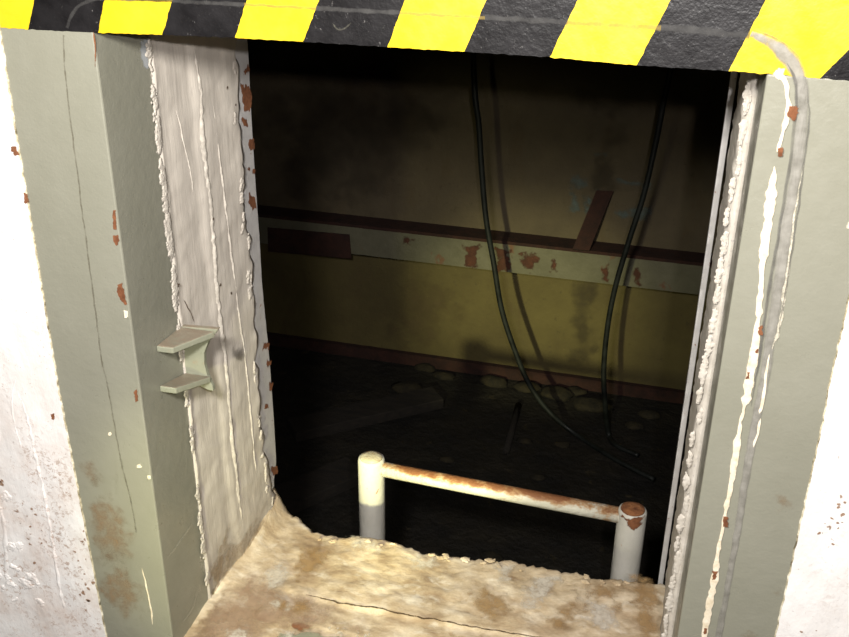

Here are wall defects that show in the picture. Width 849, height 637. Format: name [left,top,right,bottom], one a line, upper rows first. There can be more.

rust [240,65,252,127]
spalling [145,36,182,330]
spalling [239,177,251,250]
rust [464,245,479,269]
rust [494,247,540,273]
peeling [661,83,752,637]
peeling [701,32,810,637]
spalling [260,453,274,506]
spalling [194,484,206,559]
crack [306,594,540,637]